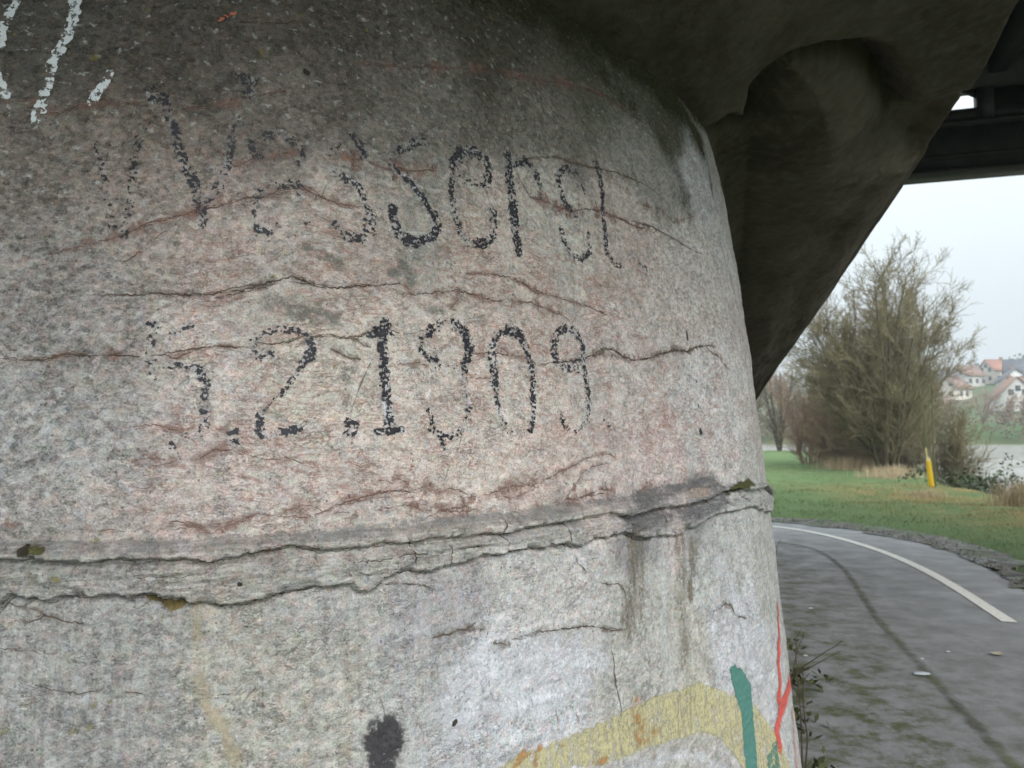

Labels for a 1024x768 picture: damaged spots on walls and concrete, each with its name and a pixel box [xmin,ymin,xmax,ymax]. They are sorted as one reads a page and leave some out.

crack [528,156,701,254]
crack [86,276,400,298]
crack [0,329,414,363]
crack [541,344,733,373]
crack [226,452,612,591]
crack [562,519,627,599]